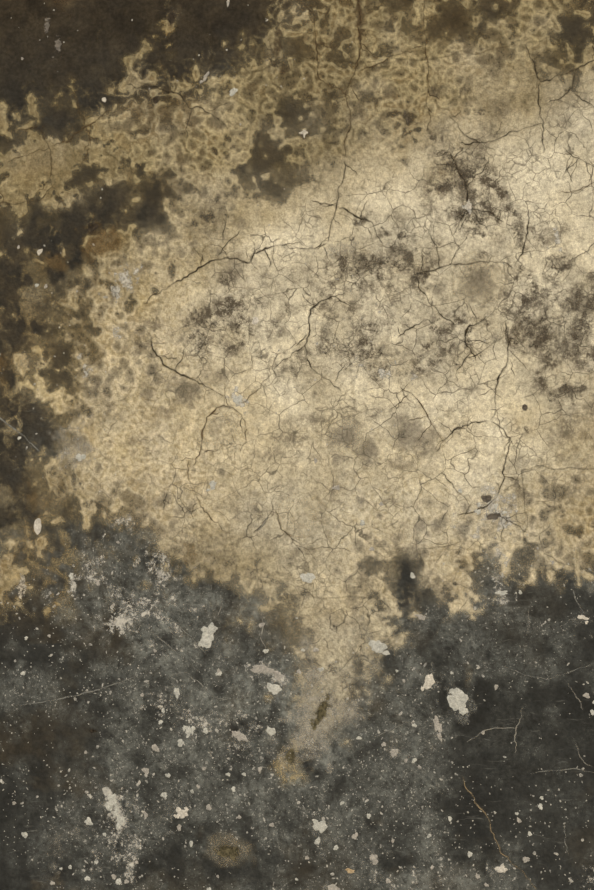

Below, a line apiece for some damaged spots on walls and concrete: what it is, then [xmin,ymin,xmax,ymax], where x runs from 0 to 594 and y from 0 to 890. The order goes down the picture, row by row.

water stain [0,101,21,139]
water stain [26,93,40,123]
crack [145,1,389,304]
crack [497,46,594,151]
water stain [19,258,55,324]
crack [151,341,206,387]
crack [181,294,350,473]
crack [398,306,485,370]
crack [396,388,518,534]
water stain [0,523,76,609]
water stain [106,587,182,634]
water stain [102,780,145,879]